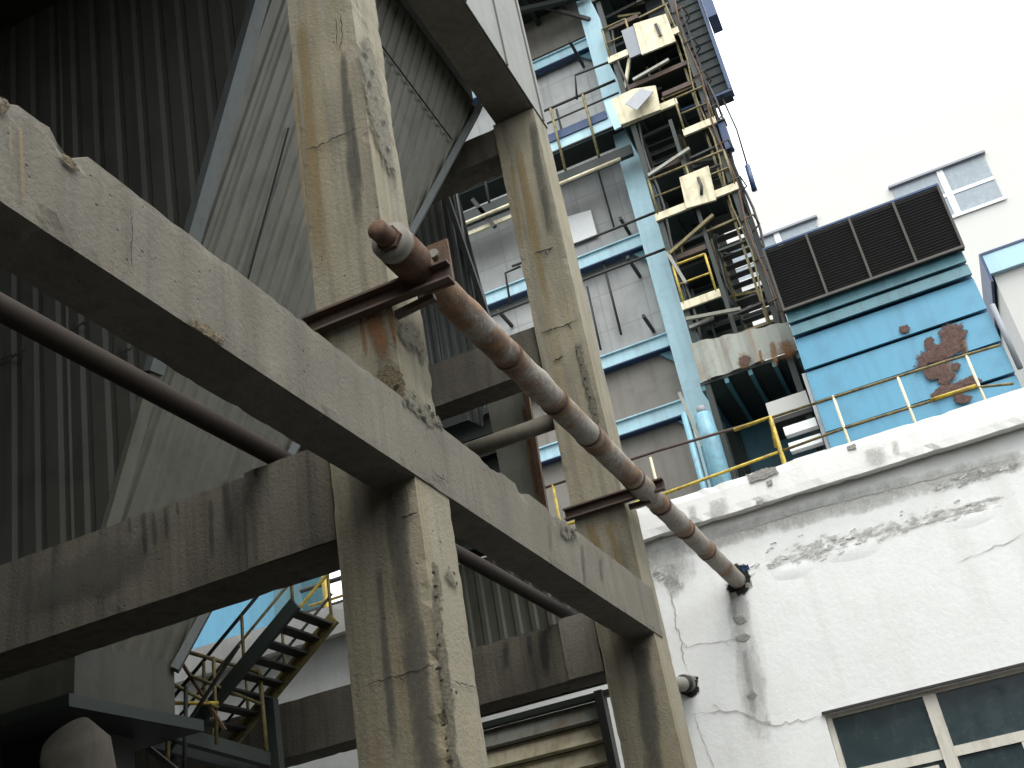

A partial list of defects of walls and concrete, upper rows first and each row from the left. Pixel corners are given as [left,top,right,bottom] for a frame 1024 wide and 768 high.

crack [305,129,353,150]
spalling [355,38,397,180]
spalling [377,365,443,430]
rust [739,341,794,366]
rust [913,323,982,404]
peeling [934,463,1018,490]
peeling [726,497,1002,598]
crack [666,581,740,665]
crack [366,664,435,686]
spalling [432,562,463,768]